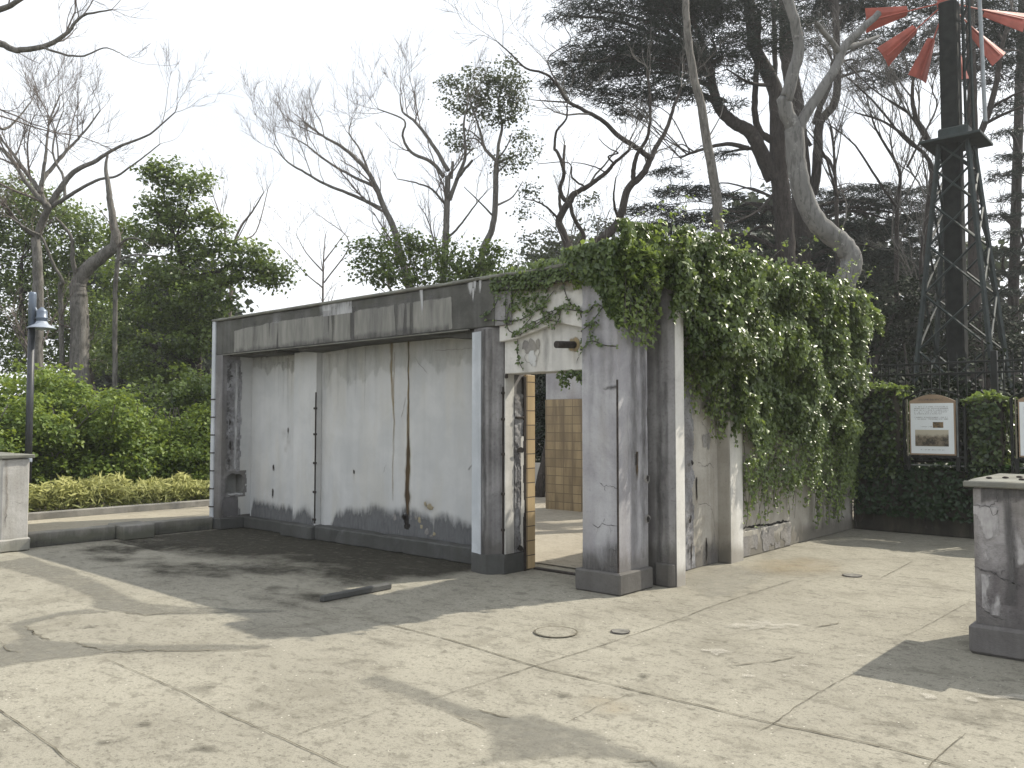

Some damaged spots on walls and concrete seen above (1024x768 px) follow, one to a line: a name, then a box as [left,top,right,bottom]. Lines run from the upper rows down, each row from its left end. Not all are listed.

peeling [222,297,452,517]
corrosion [393,342,410,530]
spalling [514,394,524,553]
leakage [86,502,484,582]
crack [743,520,791,556]
peeling [973,506,998,540]
peeling [1016,535,1024,565]
peeling [981,574,1000,616]